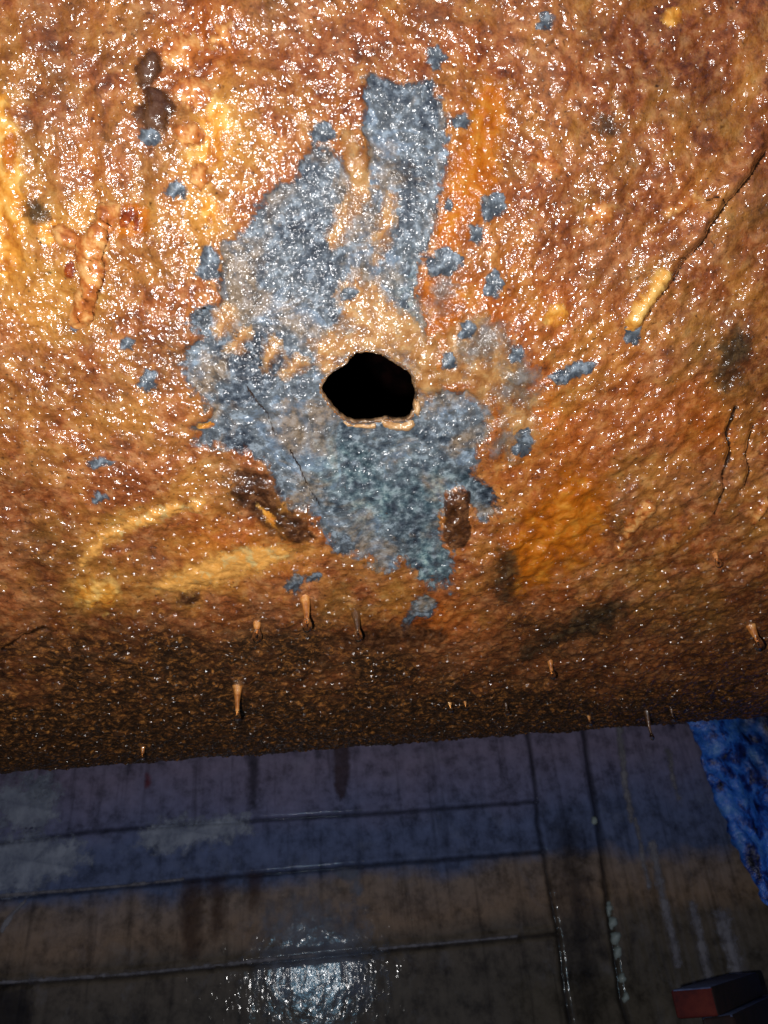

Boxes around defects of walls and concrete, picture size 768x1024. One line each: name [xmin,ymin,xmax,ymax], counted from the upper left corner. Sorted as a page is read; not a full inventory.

corrosion [0,94,150,330]
crack [643,151,766,321]
corrosion [625,268,672,331]
corrosion [154,73,544,651]
peeling [344,400,421,431]
crack [713,406,753,514]
corrosion [77,498,206,568]
corrosion [496,471,611,593]
corrosion [614,499,657,557]
damp [496,549,518,598]
damp [606,901,622,959]
damp [618,973,629,1002]